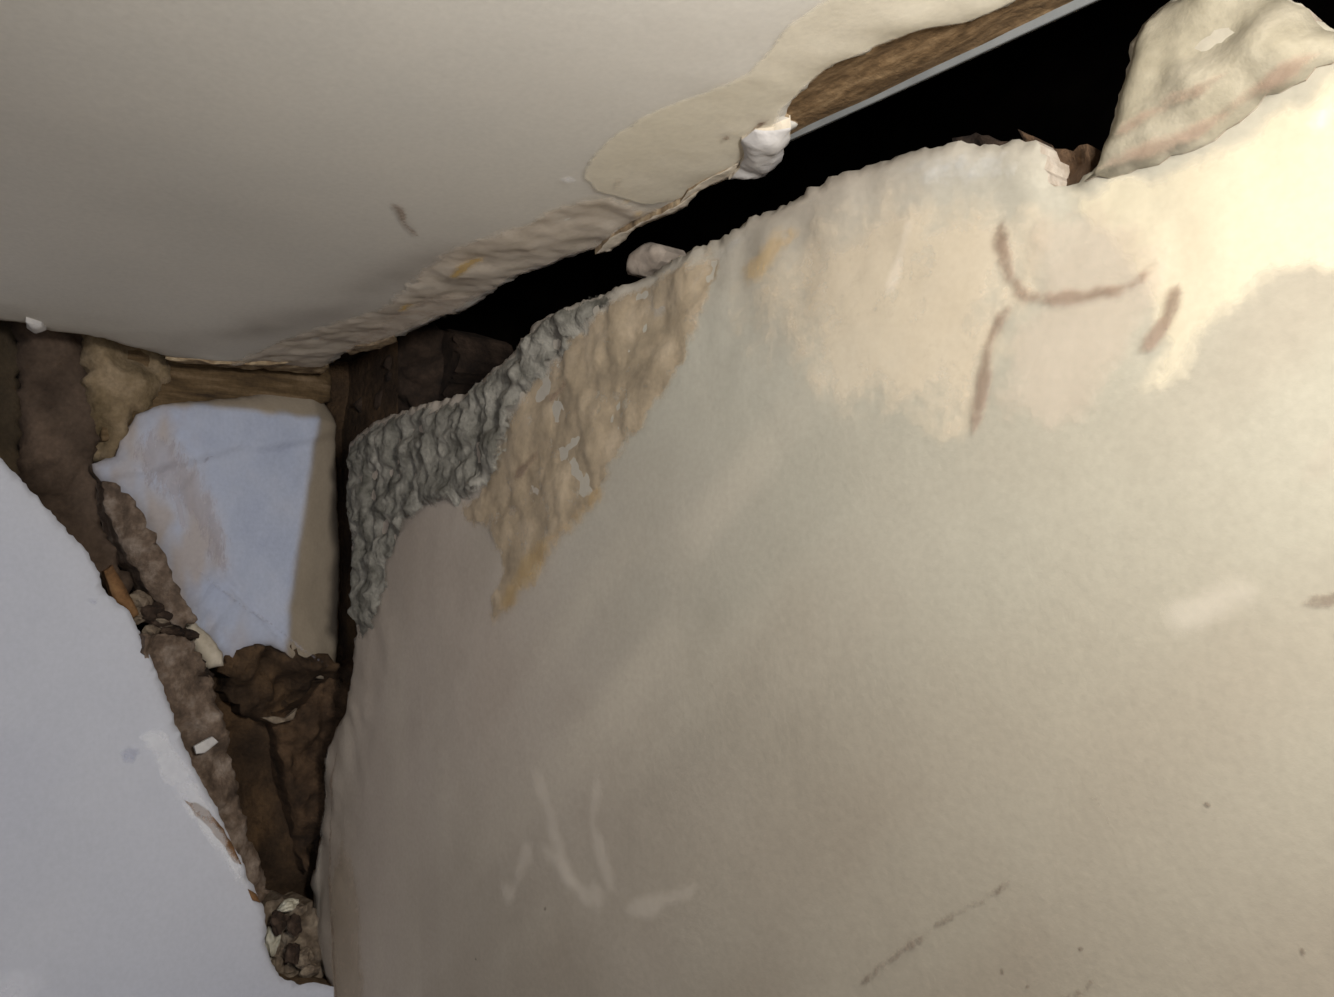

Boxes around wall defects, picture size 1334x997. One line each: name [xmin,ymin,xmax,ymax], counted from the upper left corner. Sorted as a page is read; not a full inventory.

flaking render [1085,0,1334,181]
flaking render [0,162,739,980]